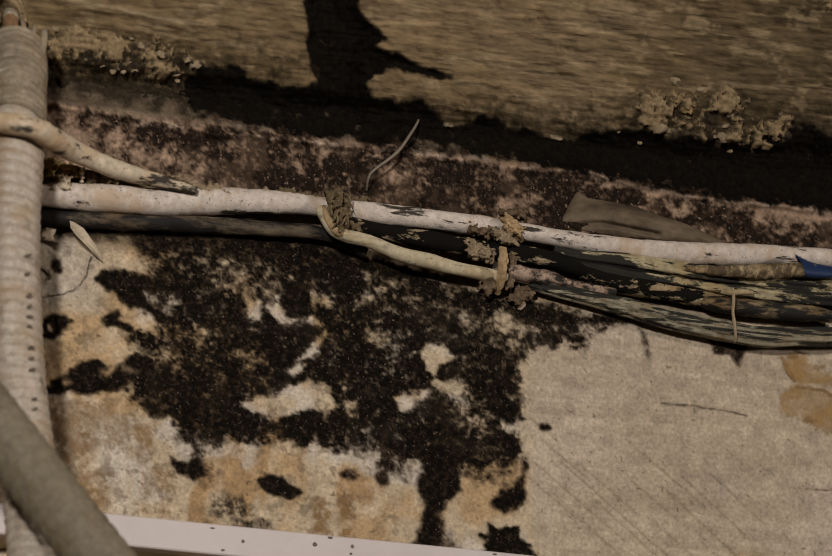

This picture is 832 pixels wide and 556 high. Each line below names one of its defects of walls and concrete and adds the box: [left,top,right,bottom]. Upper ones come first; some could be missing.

spalling [0,0,27,26]
crack [303,0,453,124]
spalling [635,77,794,153]
leakage [42,229,630,547]
leakage [478,522,538,556]